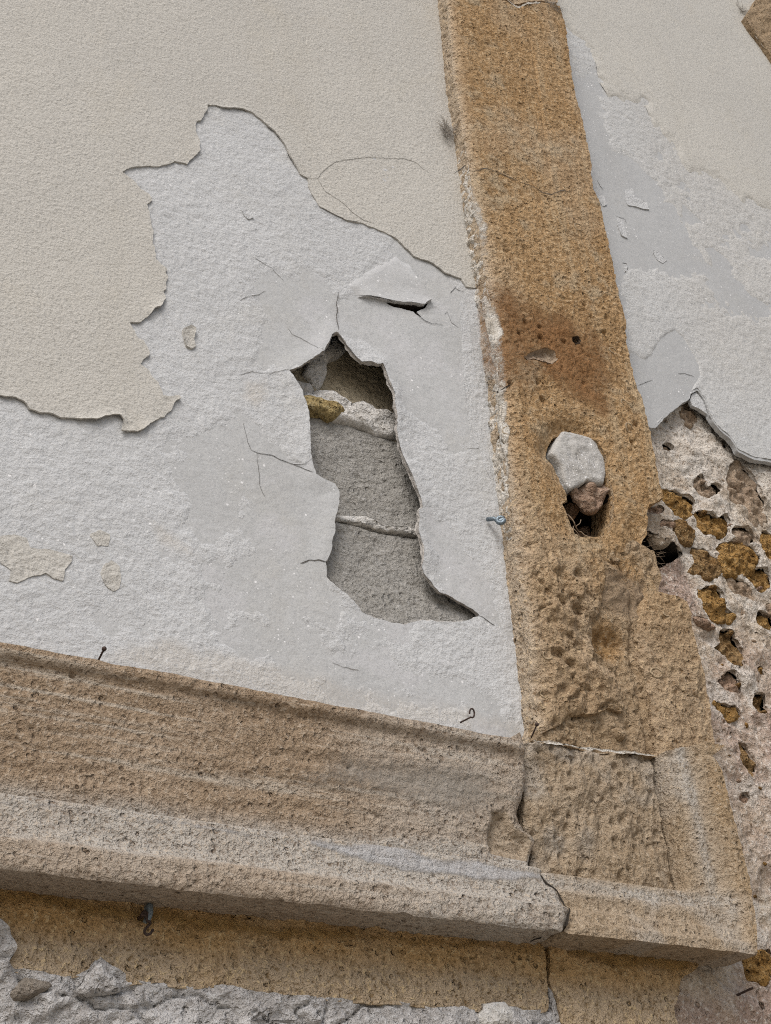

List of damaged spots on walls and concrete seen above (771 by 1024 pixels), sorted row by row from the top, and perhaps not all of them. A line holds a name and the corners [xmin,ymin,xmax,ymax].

peeling [566,28,604,83]
crack [308,157,429,224]
peeling [0,106,524,734]
crack [244,427,312,488]
spalling [525,88,771,1024]
crack [540,875,571,926]
crack [547,987,559,1023]